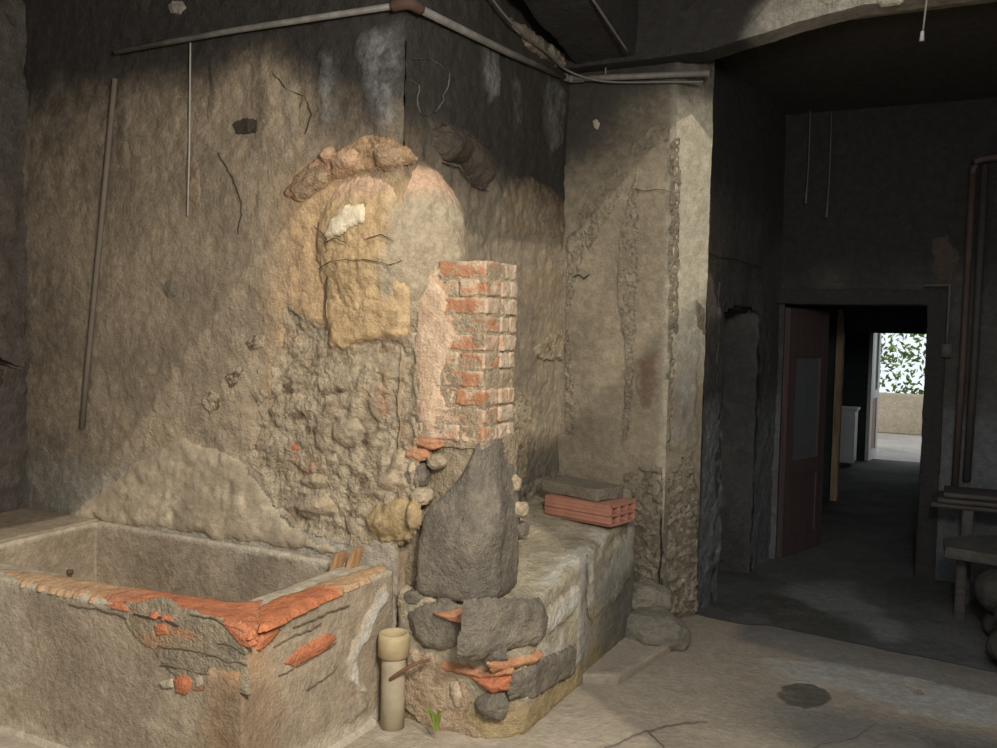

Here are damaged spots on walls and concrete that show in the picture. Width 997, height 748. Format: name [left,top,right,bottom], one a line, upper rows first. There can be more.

flaking render [508,18,566,67]
crack [272,73,312,134]
crack [410,58,450,116]
crack [218,152,242,234]
spalling [246,277,422,547]
flaking render [0,565,387,696]
leakage [752,655,997,729]
crack [604,721,707,748]